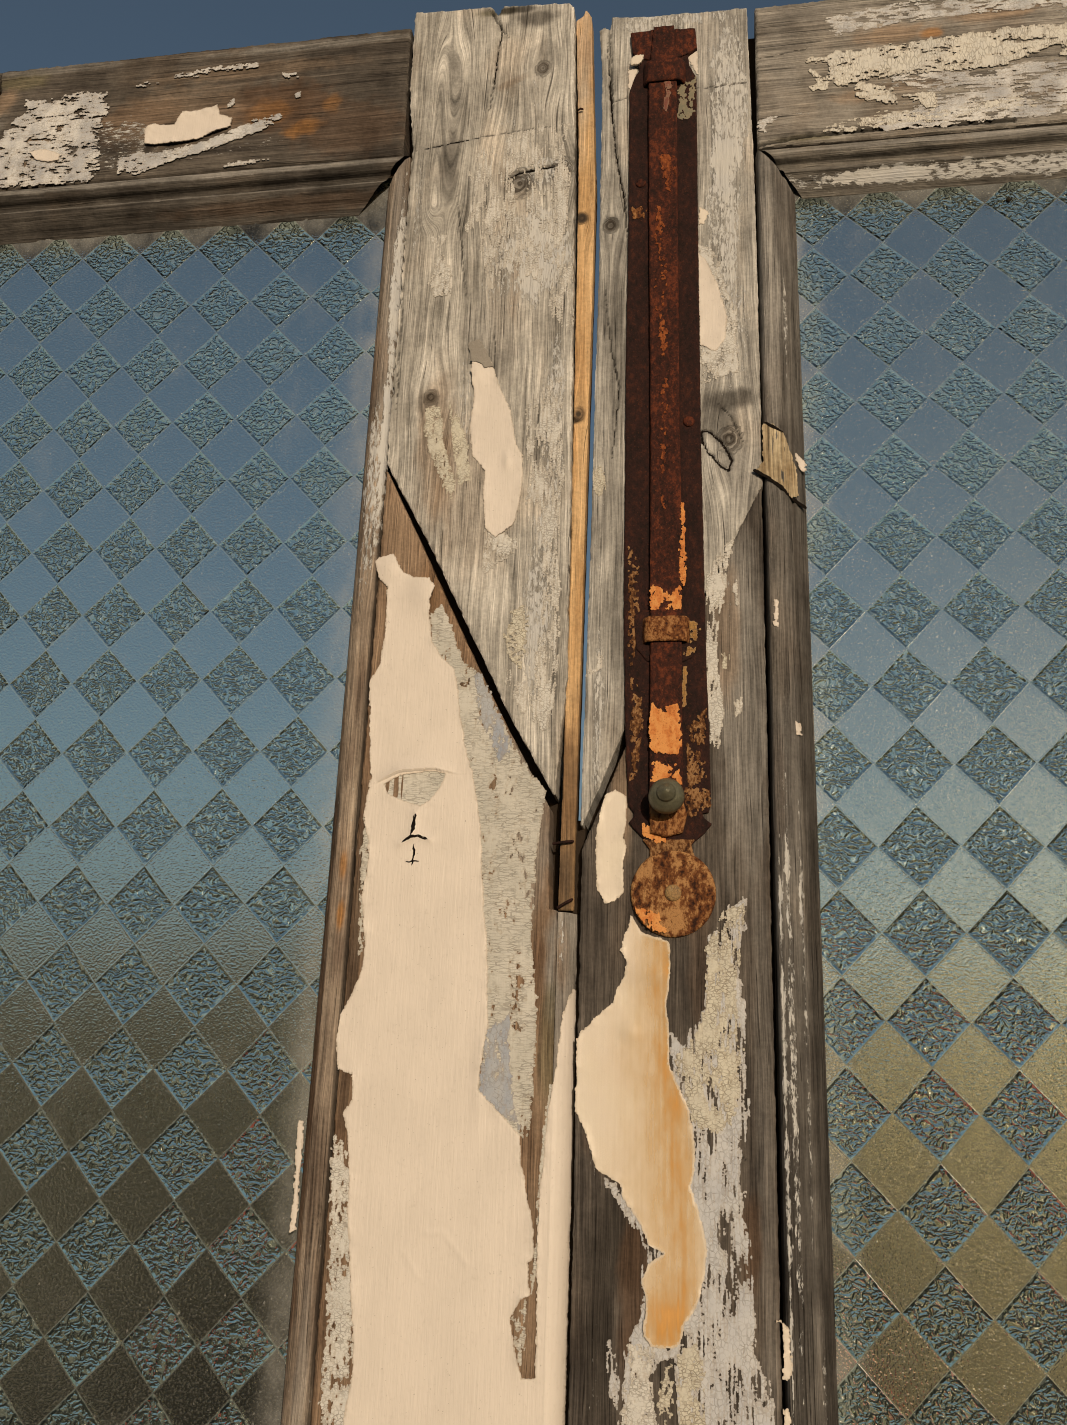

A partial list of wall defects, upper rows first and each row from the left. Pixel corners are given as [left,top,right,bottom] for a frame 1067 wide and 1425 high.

peeling [30,149,60,162]
peeling [144,104,233,145]
corrosion [660,154,677,192]
corrosion [663,76,696,120]
peeling [823,117,859,132]
peeling [806,22,1067,108]
corrosion [631,206,668,356]
peeling [468,339,536,537]
corrosion [660,378,669,474]
corrosion [627,495,712,818]
corrosion [642,823,666,844]
peeling [336,554,746,1425]